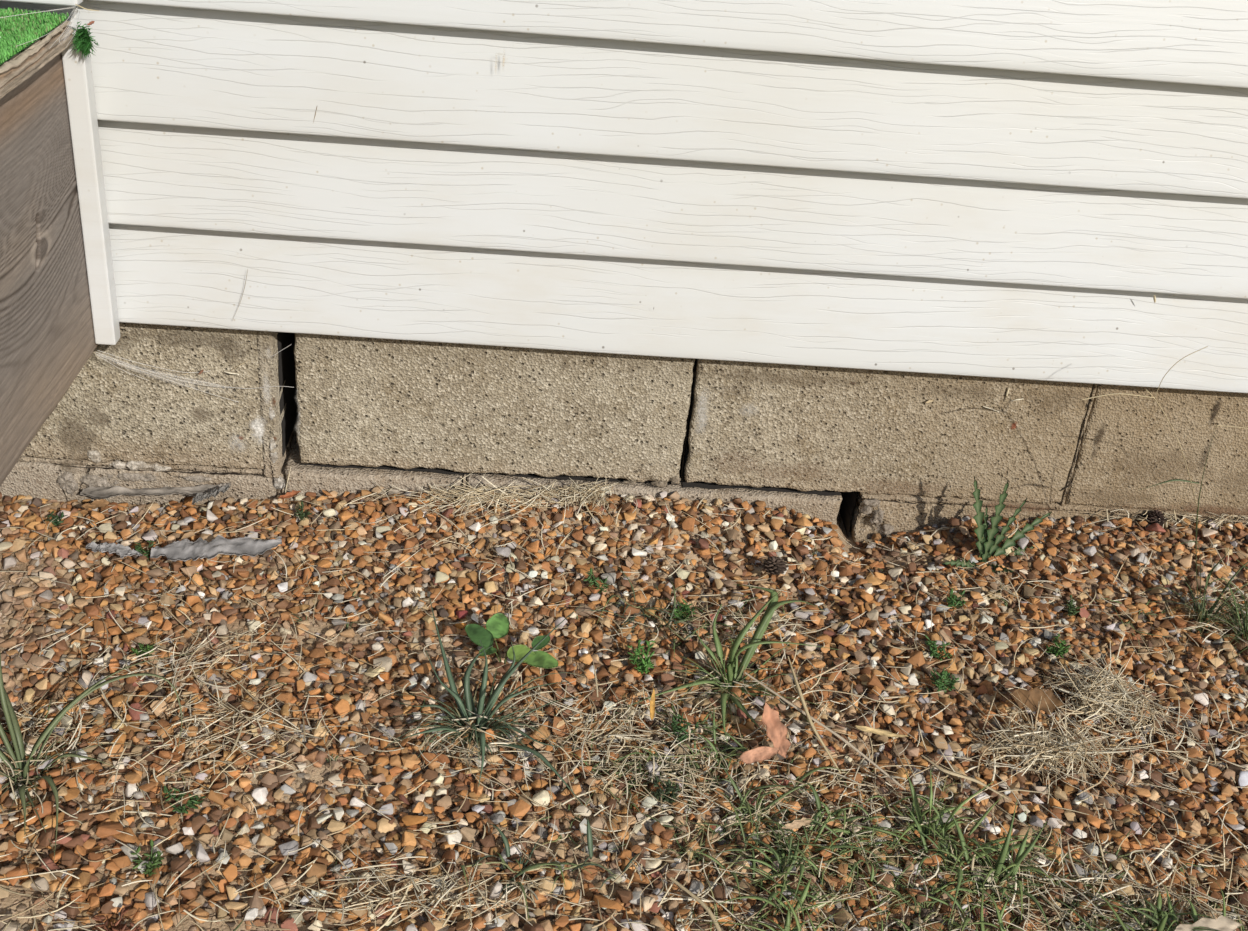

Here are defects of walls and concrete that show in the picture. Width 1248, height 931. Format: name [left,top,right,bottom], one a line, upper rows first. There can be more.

crack [864,400,1248,524]